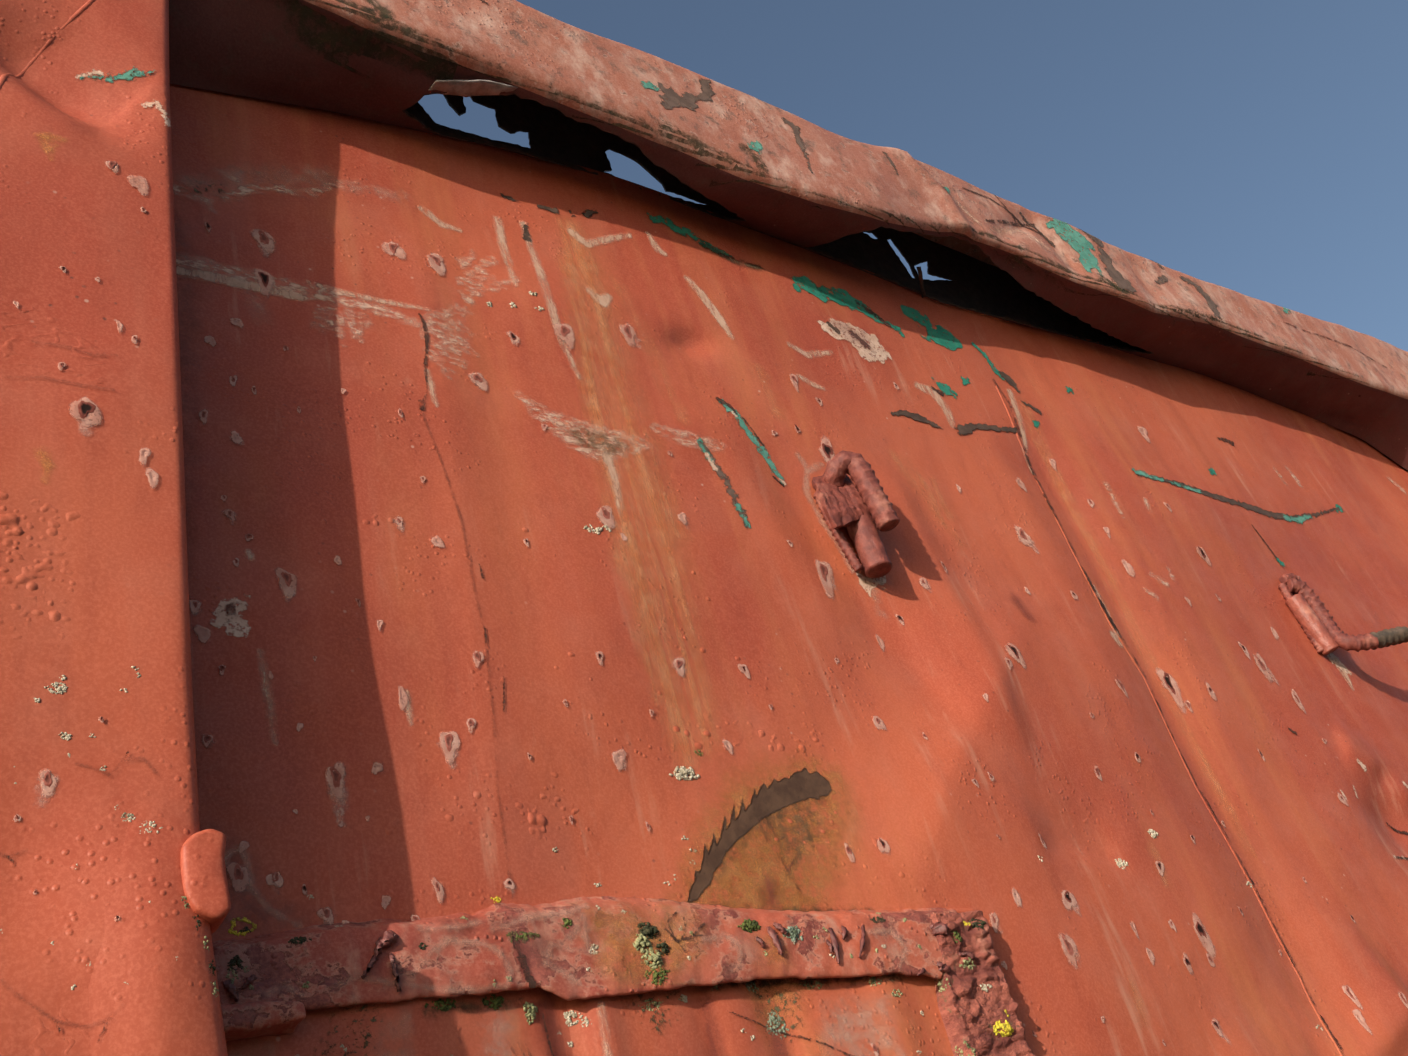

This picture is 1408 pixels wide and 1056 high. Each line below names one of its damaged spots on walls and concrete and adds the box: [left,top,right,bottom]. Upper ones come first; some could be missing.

peeling [76,66,157,83]
peeling [640,78,715,111]
peeling [1019,212,1136,293]
crack [418,313,434,410]
peeling [791,275,1020,393]
peeling [893,376,970,421]
crack [891,379,1342,1049]
corrosion [691,765,840,955]
crack [1386,822,1408,860]
corrosion [361,930,401,992]
corrosion [826,925,865,964]
corrosion [917,951,977,976]